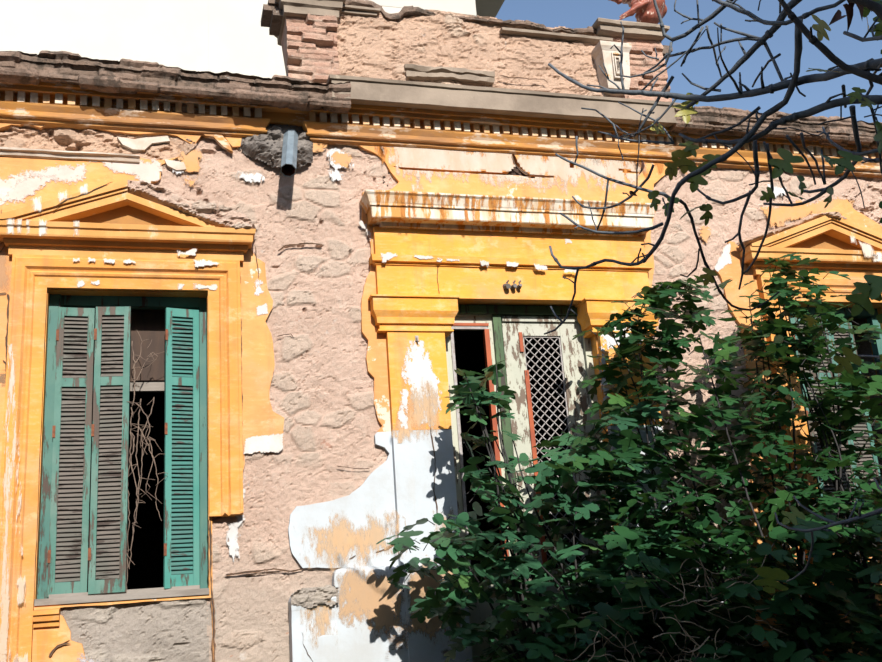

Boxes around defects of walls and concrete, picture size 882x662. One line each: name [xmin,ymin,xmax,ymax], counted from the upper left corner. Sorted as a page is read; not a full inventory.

crack [511,155,554,177]
spalling [0,125,653,662]
spalling [636,168,882,539]